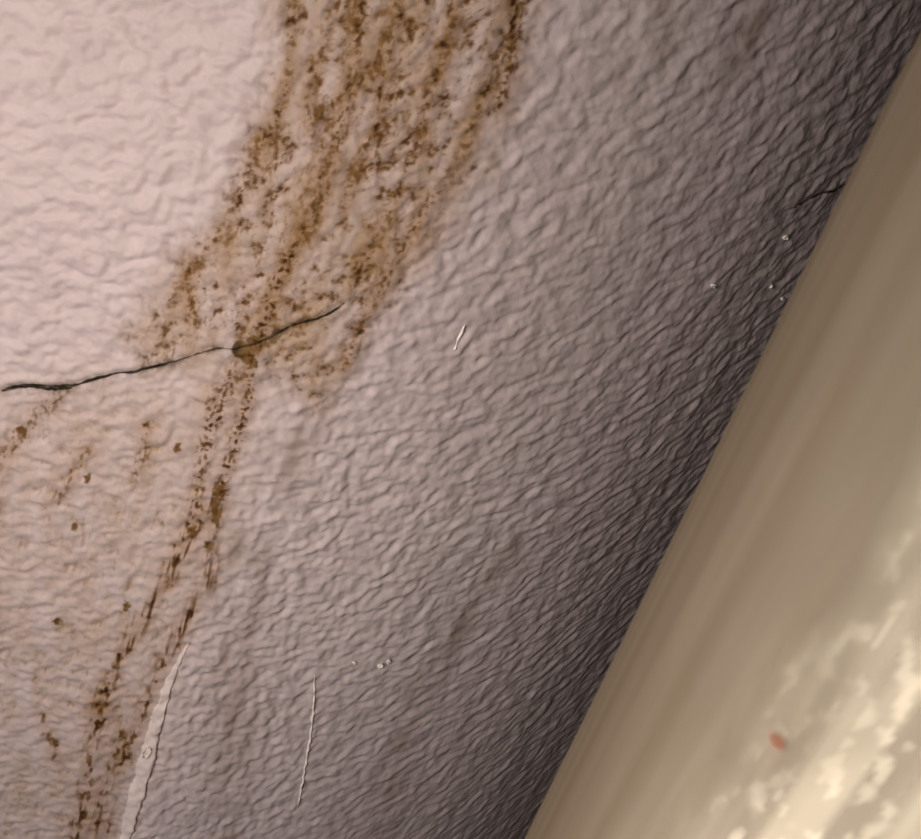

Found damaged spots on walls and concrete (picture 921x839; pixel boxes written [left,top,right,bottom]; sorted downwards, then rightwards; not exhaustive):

crack [778,183,846,217]
crack [1,303,344,392]
leakage [1,396,62,457]
leakage [54,348,255,839]